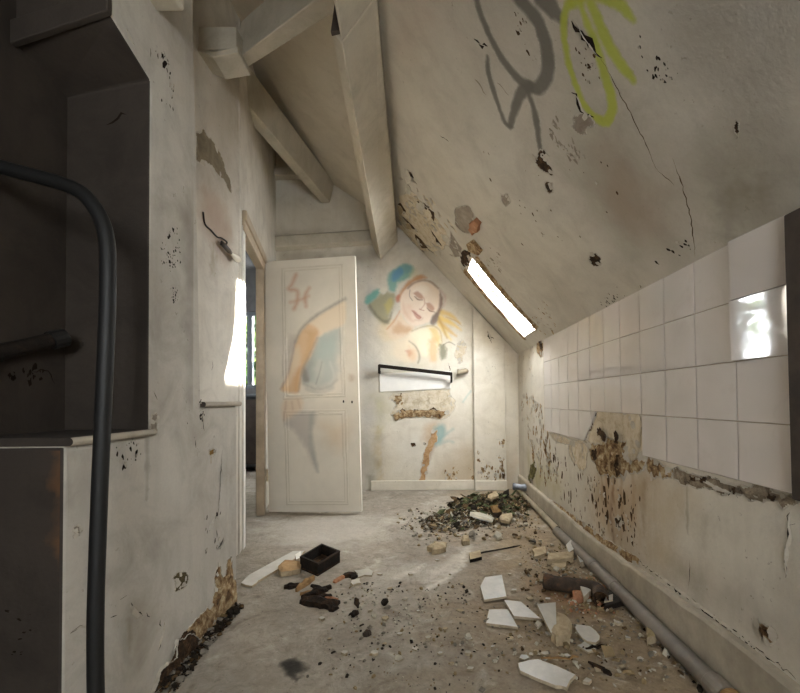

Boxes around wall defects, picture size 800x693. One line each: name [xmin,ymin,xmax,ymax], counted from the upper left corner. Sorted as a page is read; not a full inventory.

spalling [196,128,232,193]
spalling [532,148,554,194]
crack [571,19,695,254]
spalling [388,170,799,567]
spalling [151,555,238,693]
spalling [753,616,778,648]